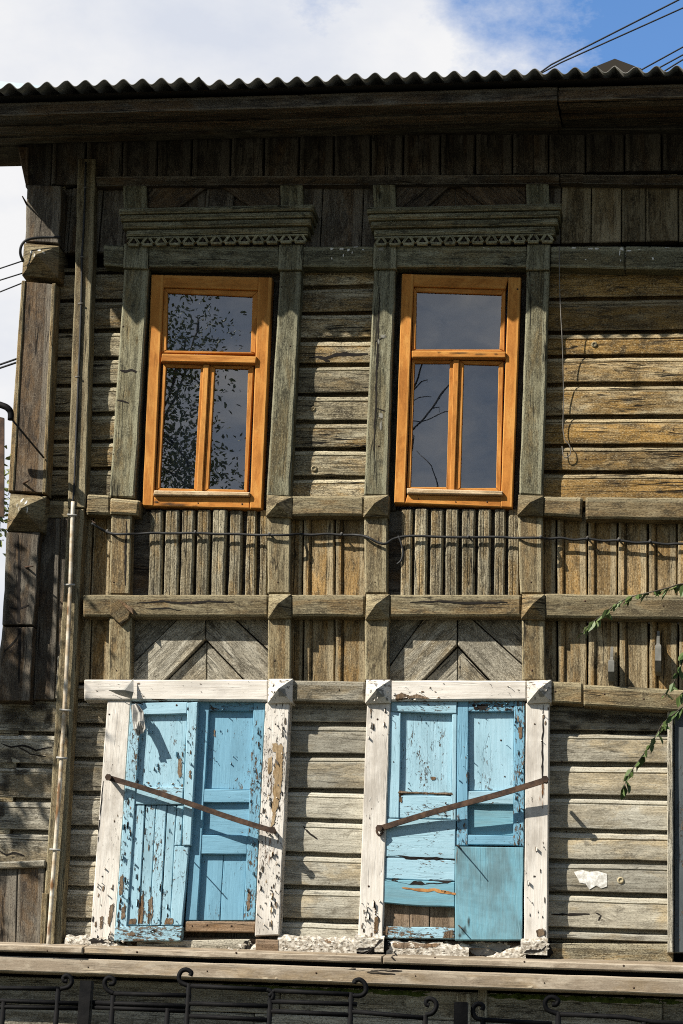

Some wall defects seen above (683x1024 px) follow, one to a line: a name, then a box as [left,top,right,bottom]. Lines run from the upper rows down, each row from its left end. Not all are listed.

peeling [66,799,181,947]
peeling [132,707,193,794]
peeling [246,718,286,927]
peeling [368,683,444,739]
peeling [398,774,459,818]
peeling [472,703,525,844]